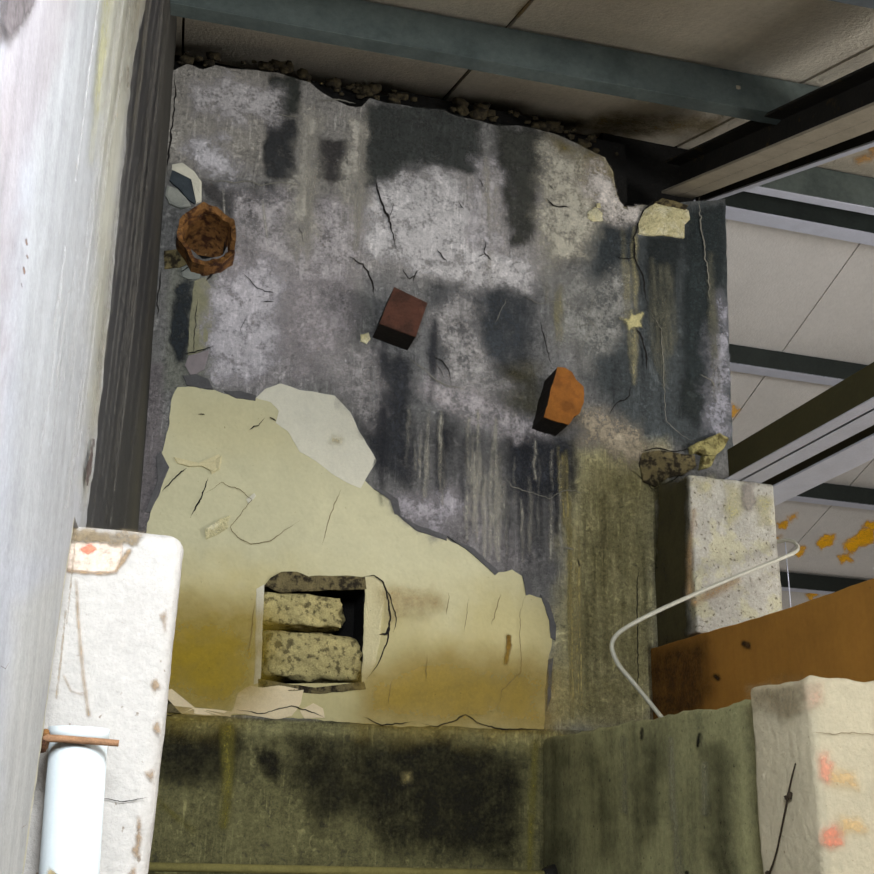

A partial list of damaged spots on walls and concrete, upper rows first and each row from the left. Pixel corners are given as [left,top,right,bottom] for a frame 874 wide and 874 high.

crack [375,173,417,280]
spalling [638,198,690,239]
water stain [169,280,192,362]
water stain [183,76,650,708]
crack [608,199,695,491]
water stain [648,208,731,435]
crack [192,480,297,544]
peeling [56,249,556,729]
crack [365,575,397,677]
crack [365,600,540,731]
water stain [146,722,244,827]
water stain [297,737,536,868]